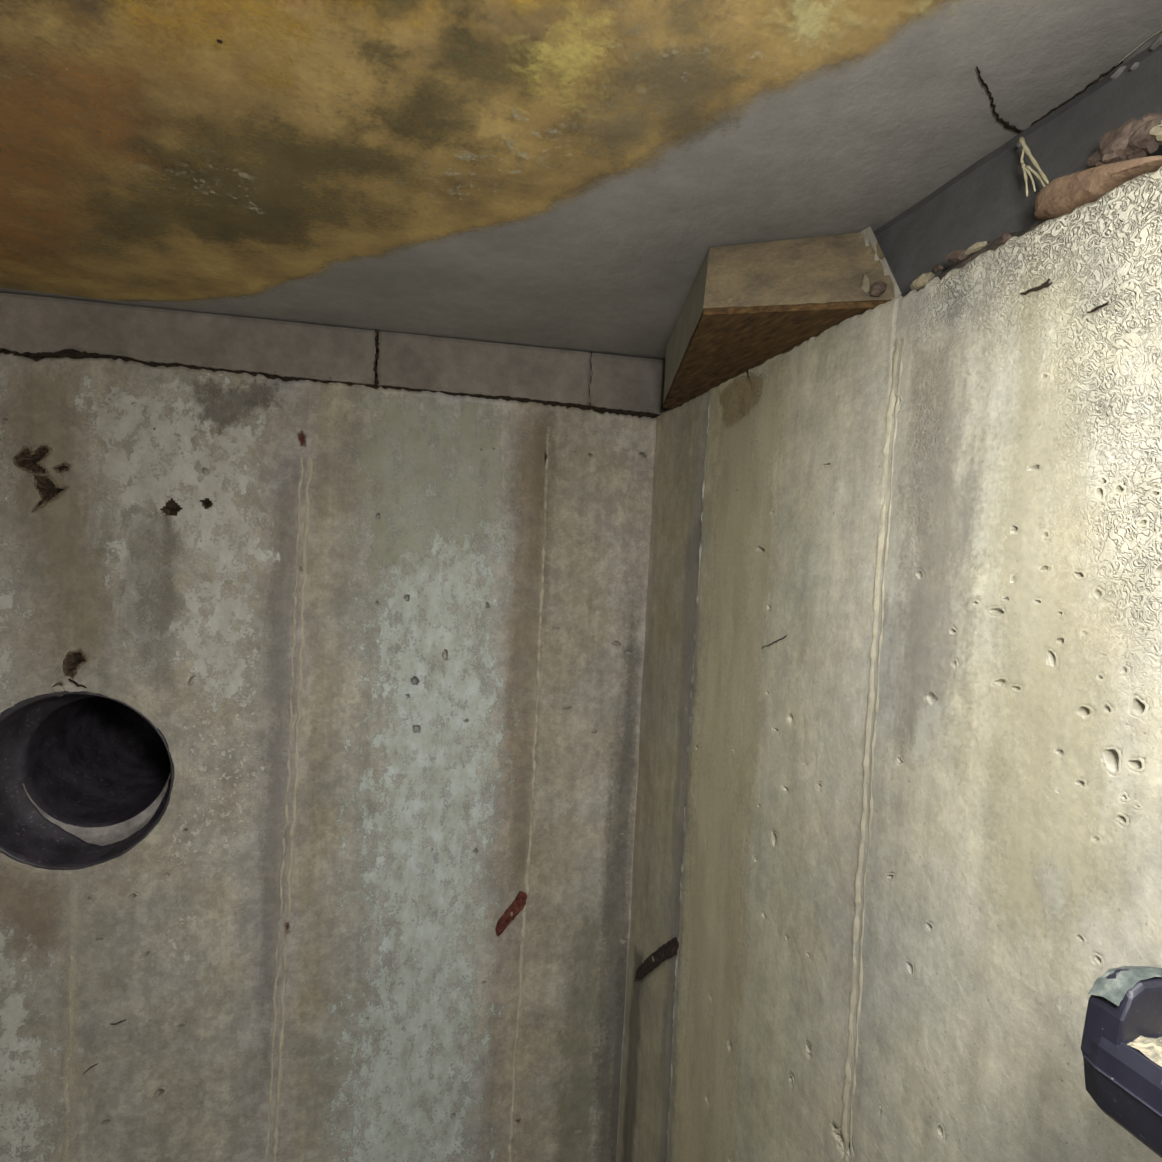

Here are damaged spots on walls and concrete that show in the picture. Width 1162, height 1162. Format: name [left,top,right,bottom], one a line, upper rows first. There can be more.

crack [976,61,1123,133]
water stain [0,0,946,301]
crack [0,329,654,418]
spalling [12,445,71,513]
rust [495,891,527,936]
rust [635,937,679,980]